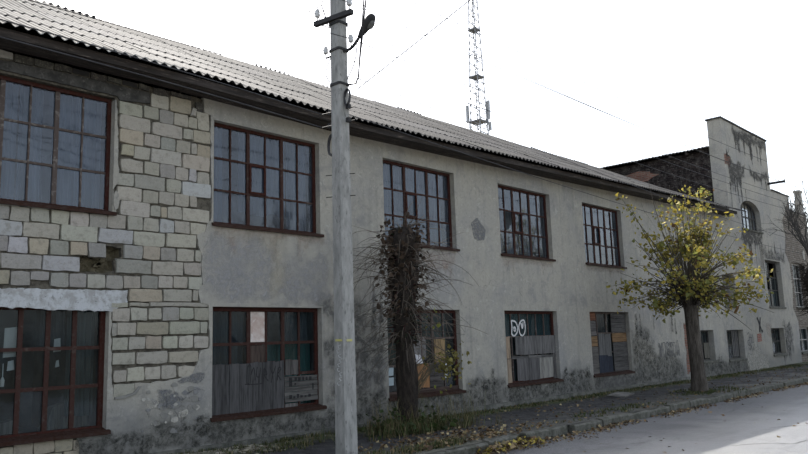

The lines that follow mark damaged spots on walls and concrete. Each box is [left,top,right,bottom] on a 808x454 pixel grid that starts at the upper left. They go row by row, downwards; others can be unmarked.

leakage [728,127,768,207]
flaking render [0,49,211,433]
leakage [418,326,683,413]